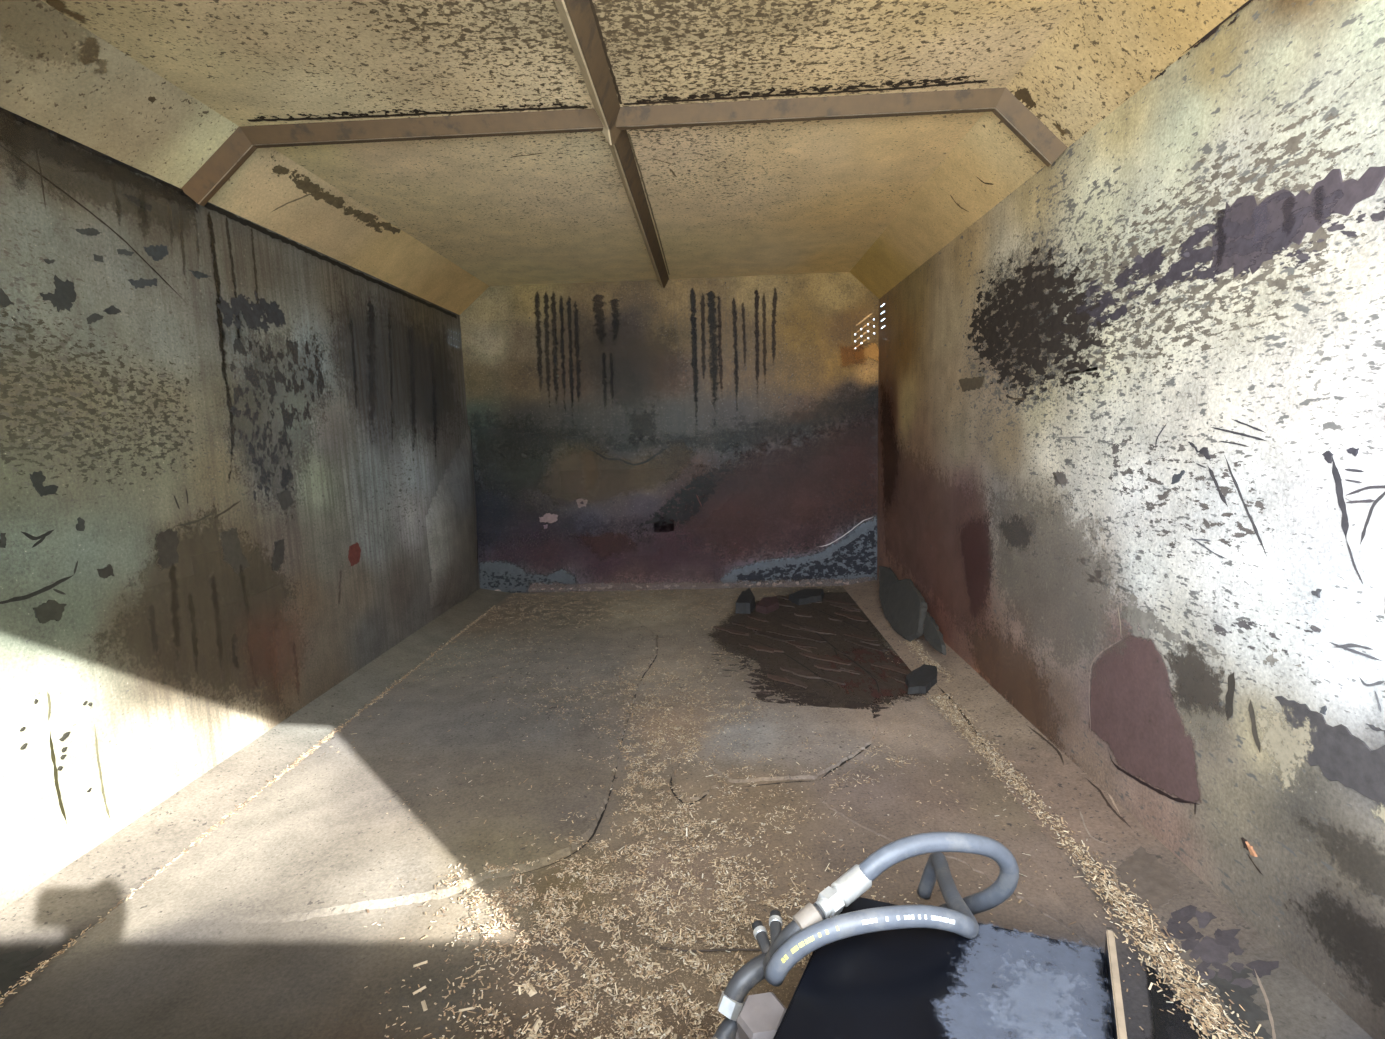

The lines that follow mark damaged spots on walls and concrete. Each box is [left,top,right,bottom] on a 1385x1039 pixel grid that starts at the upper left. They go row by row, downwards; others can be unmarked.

peeling [75,228,102,236]
peeling [93,244,169,262]
peeling [965,81,1385,407]
peeling [0,259,204,499]
damp [534,291,619,408]
damp [690,288,778,417]
peeling [0,530,54,548]
damp [478,517,929,709]
crack [507,647,658,878]
crack [670,774,707,805]
crack [744,744,871,787]
corrosion [1089,636,1201,814]